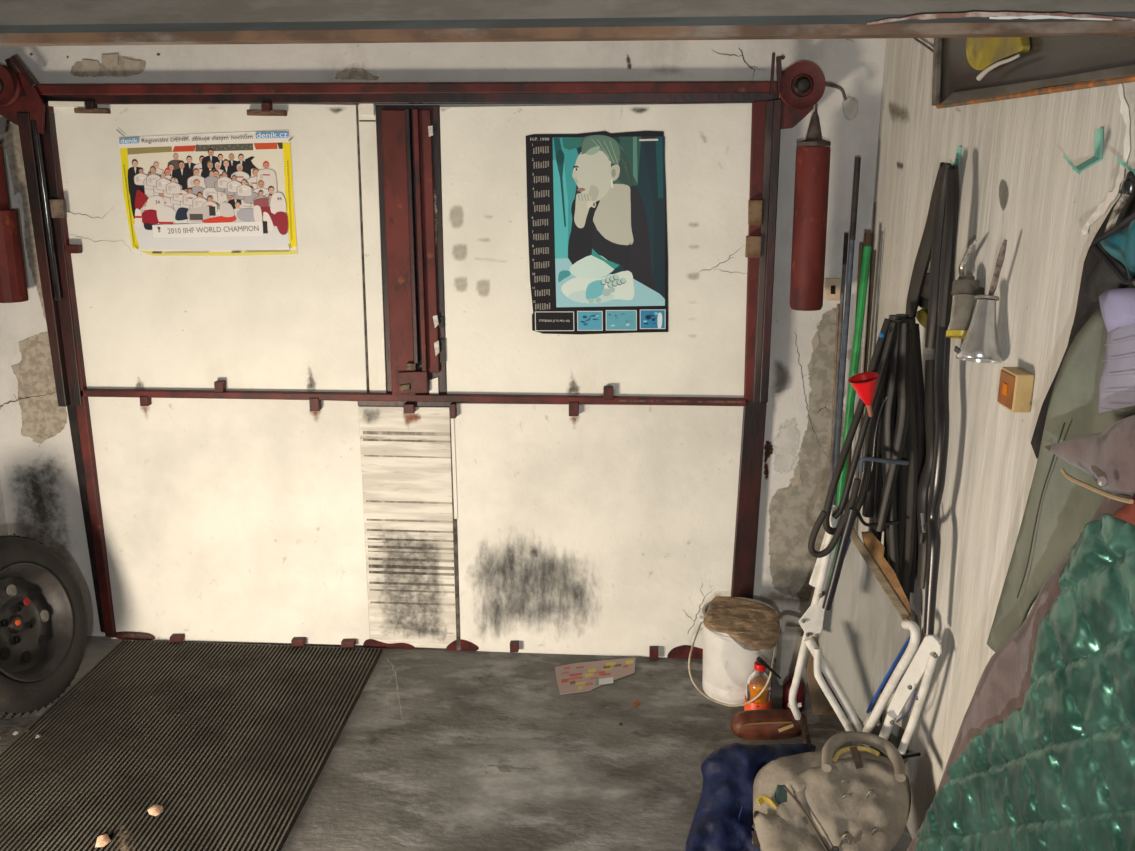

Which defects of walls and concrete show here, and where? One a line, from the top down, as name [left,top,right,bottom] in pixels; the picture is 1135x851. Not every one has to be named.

peeling [70,54,146,77]
peeling [0,117,67,444]
peeling [769,308,846,600]
water stain [13,465,68,560]
water stain [383,539,439,633]
water stain [484,550,585,627]